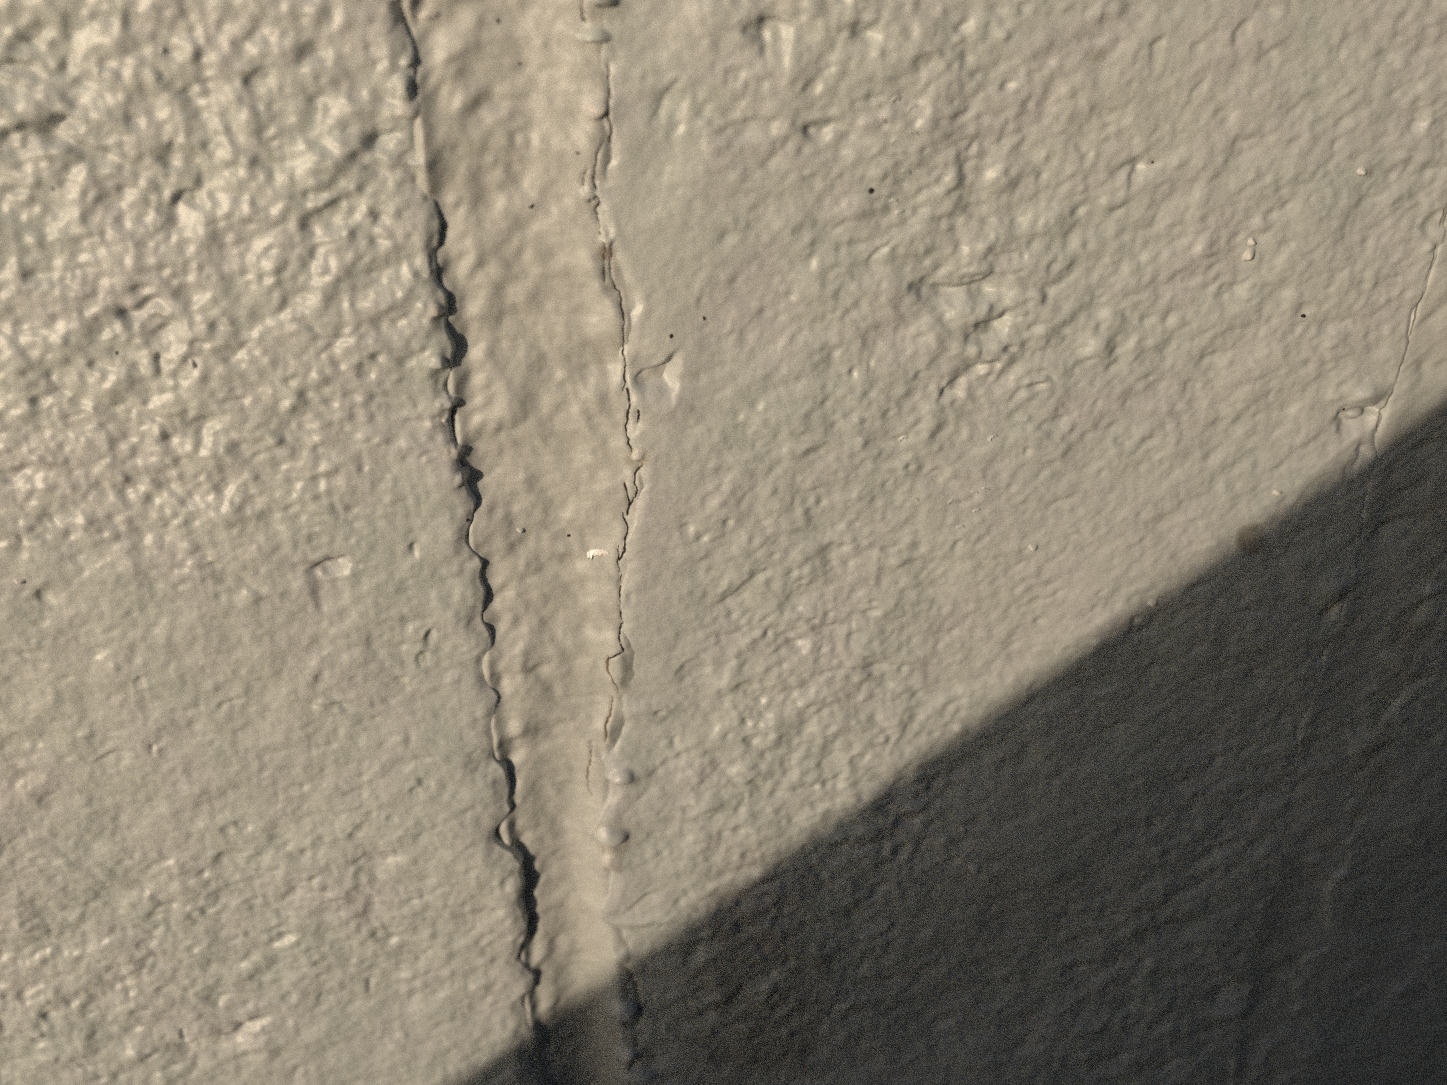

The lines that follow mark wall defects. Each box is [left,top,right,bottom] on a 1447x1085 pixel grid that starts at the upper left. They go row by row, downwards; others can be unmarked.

crack [582,63,643,796]